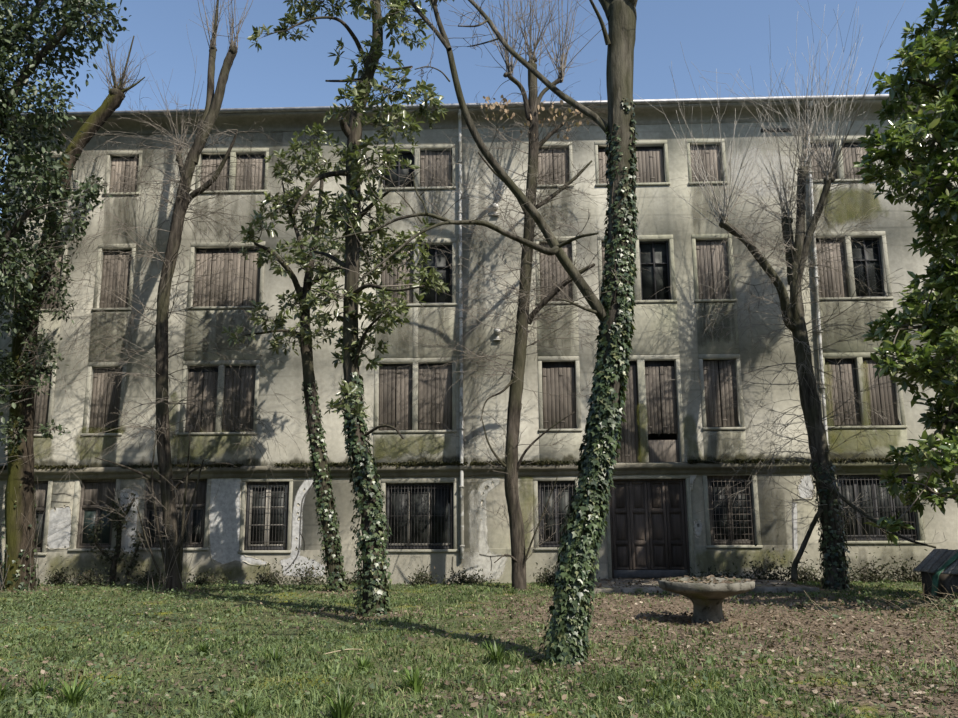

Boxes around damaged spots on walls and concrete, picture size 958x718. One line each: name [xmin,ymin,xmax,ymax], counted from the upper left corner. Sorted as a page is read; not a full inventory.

peeling [45,505,73,550]
peeling [120,487,143,555]
peeling [208,477,325,577]
peeling [462,476,507,579]